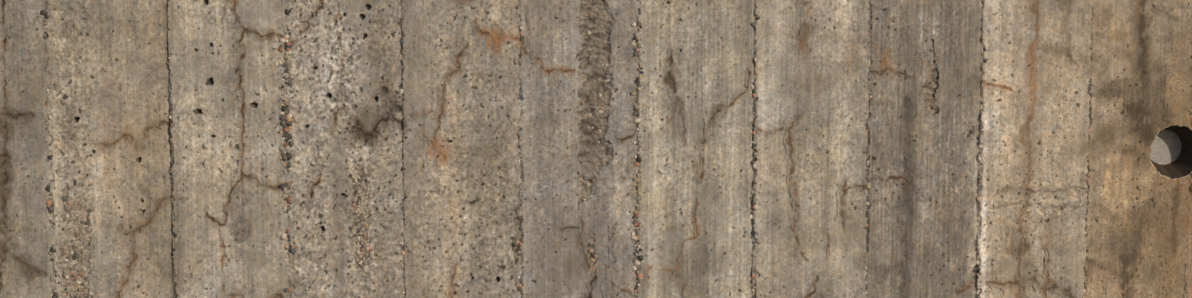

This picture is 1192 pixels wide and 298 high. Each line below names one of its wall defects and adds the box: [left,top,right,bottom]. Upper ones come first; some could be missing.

crack [90,116,173,164]
crack [109,0,345,298]
crack [443,263,458,298]
crack [327,0,577,168]
crack [611,127,637,145]
crack [655,40,753,298]
crack [756,112,911,298]
crack [873,67,916,80]
damp [1028,0,1192,298]